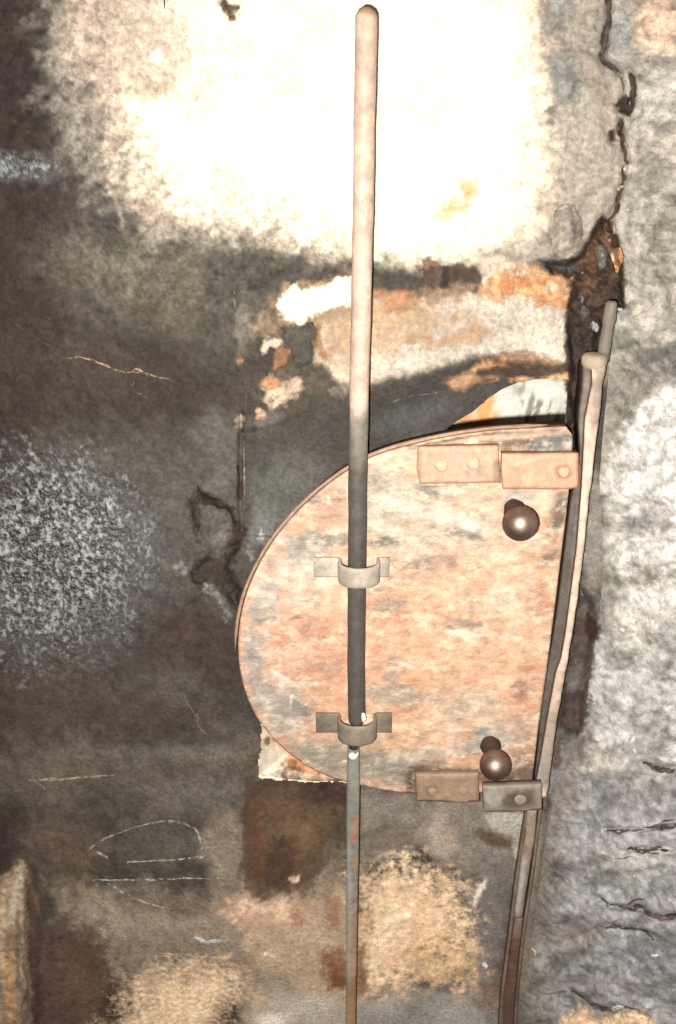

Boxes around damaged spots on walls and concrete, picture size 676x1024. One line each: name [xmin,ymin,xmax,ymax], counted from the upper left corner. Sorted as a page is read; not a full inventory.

crack [599,0,637,221]
flaking render [235,273,352,428]
spalling [542,217,626,429]
damp [0,452,151,650]
crack [602,819,676,859]
crack [643,762,674,773]
crack [601,898,676,941]